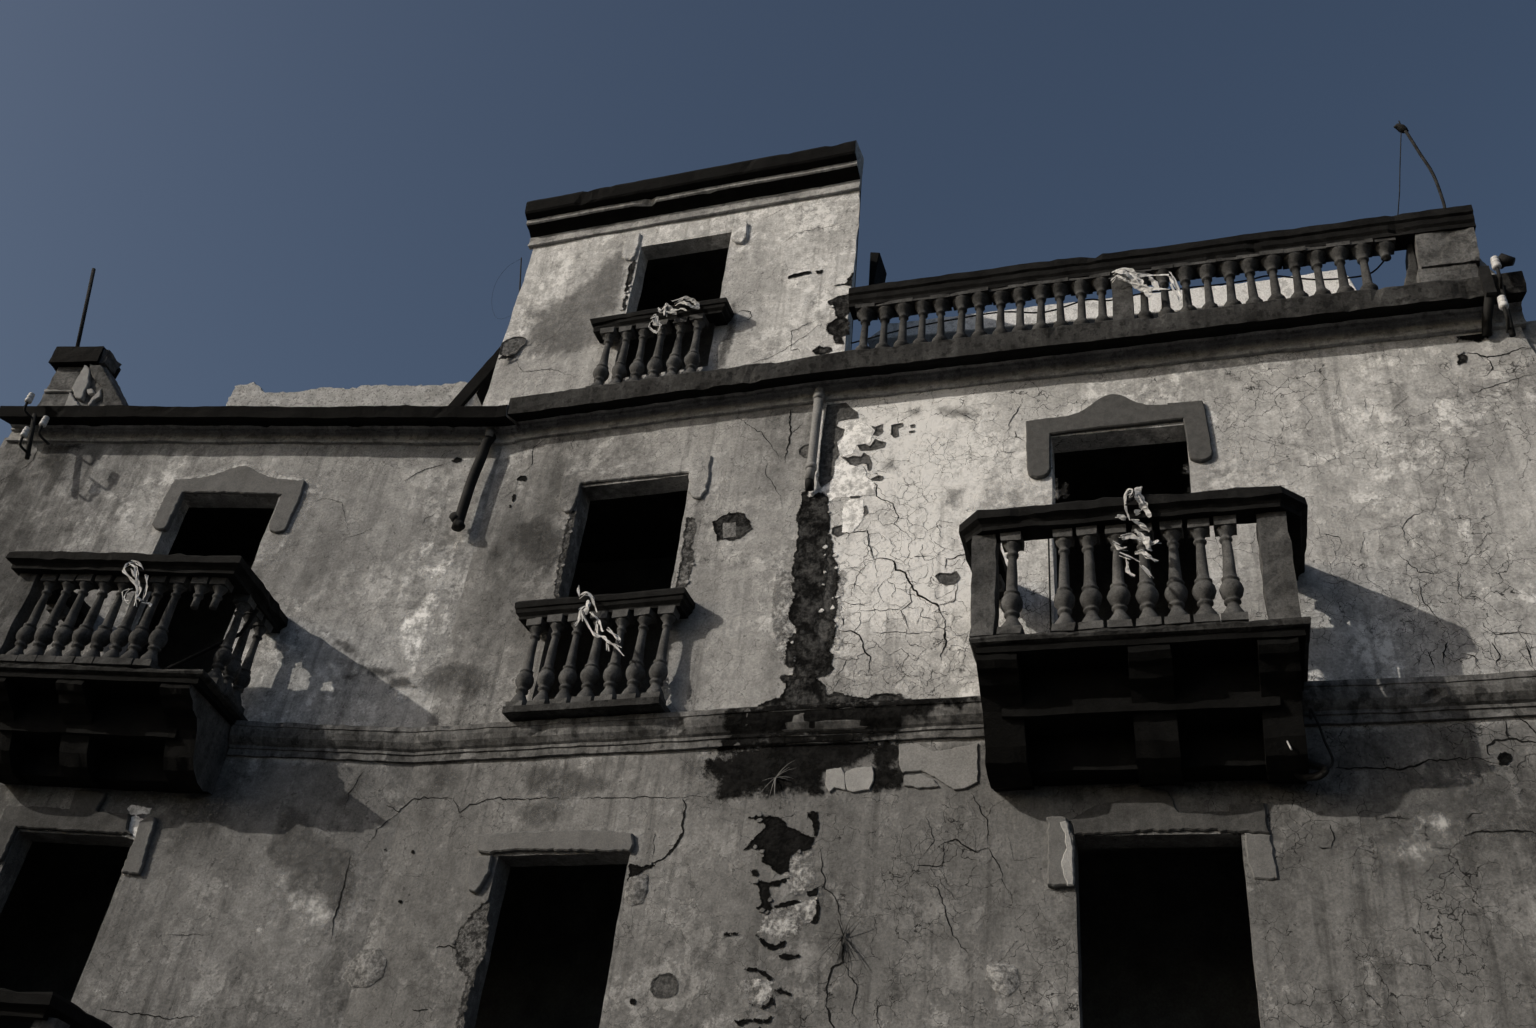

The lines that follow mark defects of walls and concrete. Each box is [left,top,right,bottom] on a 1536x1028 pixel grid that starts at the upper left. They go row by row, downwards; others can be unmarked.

spalling [675,512,753,588]
spalling [758,403,915,707]
crack [836,403,1022,686]
crack [1246,347,1535,670]
spalling [452,898,490,1028]
crack [330,772,713,941]
spalling [724,932,800,1028]
spalling [743,811,820,924]
peeling [825,766,874,793]
crack [818,850,882,1028]
crack [893,794,1035,968]
crack [1336,712,1536,772]